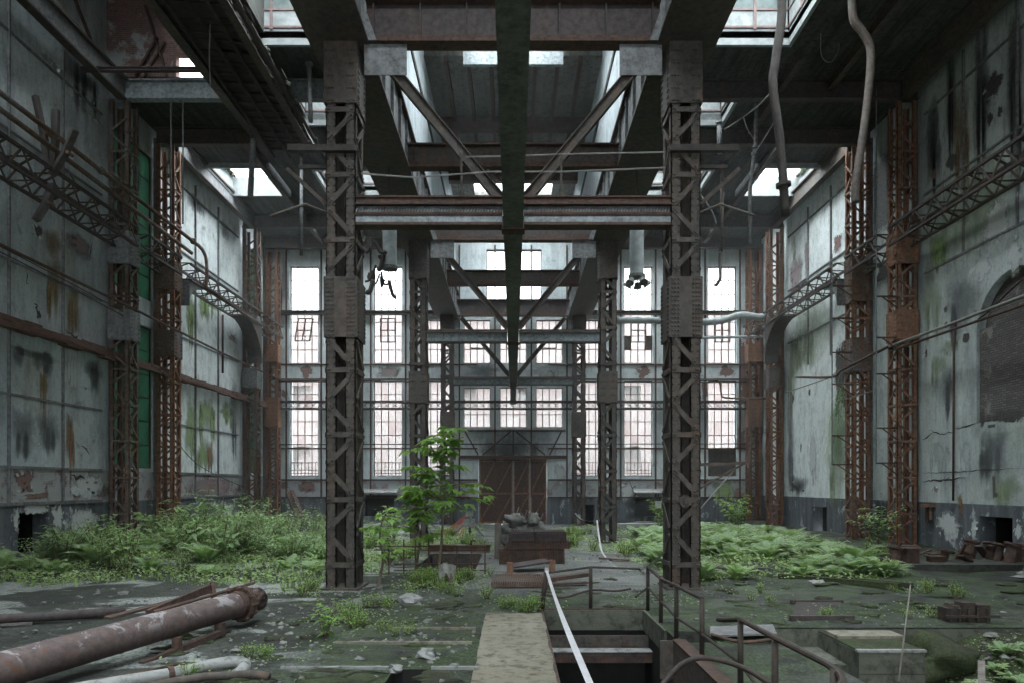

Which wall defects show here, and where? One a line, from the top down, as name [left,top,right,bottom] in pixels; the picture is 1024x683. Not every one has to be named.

leakage [976,32,988,163]
corrosion [0,266,249,399]
leakage [14,348,52,373]
leakage [16,418,55,456]
corrosion [66,418,75,480]
leakage [191,399,236,471]
crack [922,424,974,440]
crack [922,468,1023,483]
leakage [960,437,1003,478]
spalling [980,409,1024,428]
spalling [11,469,103,538]
peeling [936,511,978,541]